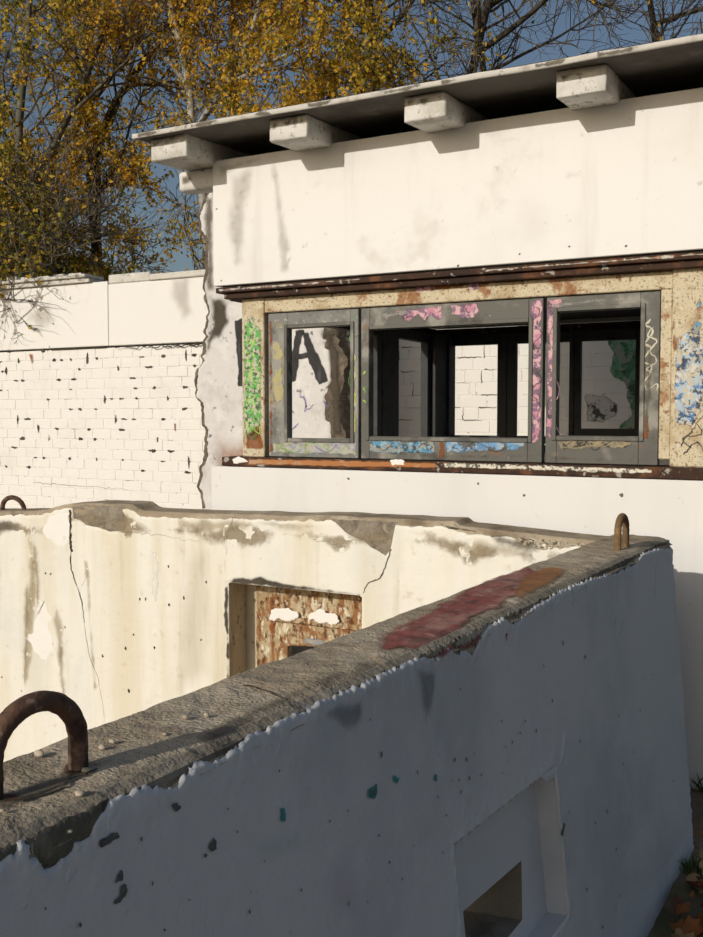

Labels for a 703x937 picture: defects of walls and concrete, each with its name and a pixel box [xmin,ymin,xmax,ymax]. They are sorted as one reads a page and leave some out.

damp [26,549,38,625]
spalling [72,505,125,532]
spalling [331,519,398,556]
crack [363,549,392,593]
spalling [515,538,585,550]
spalling [580,543,669,581]
crack [69,510,104,712]
peeling [246,584,255,671]
peeling [269,608,339,625]
spalling [0,799,108,867]
peeling [99,832,120,848]
peeling [114,870,128,904]